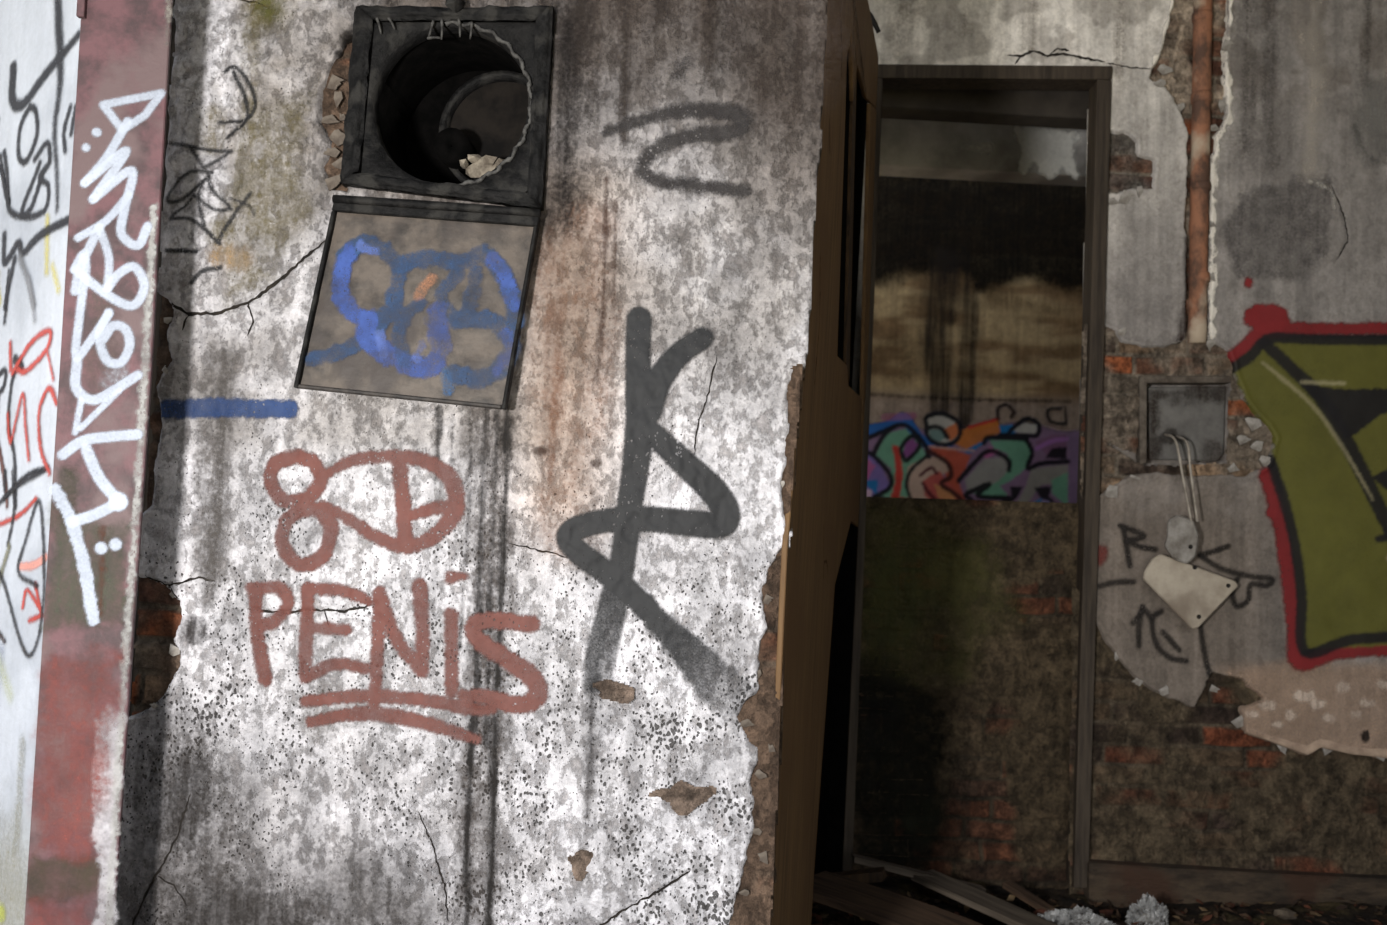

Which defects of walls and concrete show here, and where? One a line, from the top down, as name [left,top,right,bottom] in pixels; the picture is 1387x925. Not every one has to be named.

crack [1007,48,1151,69]
crack [172,240,325,335]
leakage [435,407,443,446]
flaking render [780,364,803,515]
leakage [871,247,1071,429]
flaking render [1079,0,1273,499]
corrosion [1177,240,1187,344]
peeling [91,205,182,925]
leakage [458,410,514,925]
flaking render [729,549,783,925]
flaking render [1068,588,1387,895]
crack [599,870,691,925]